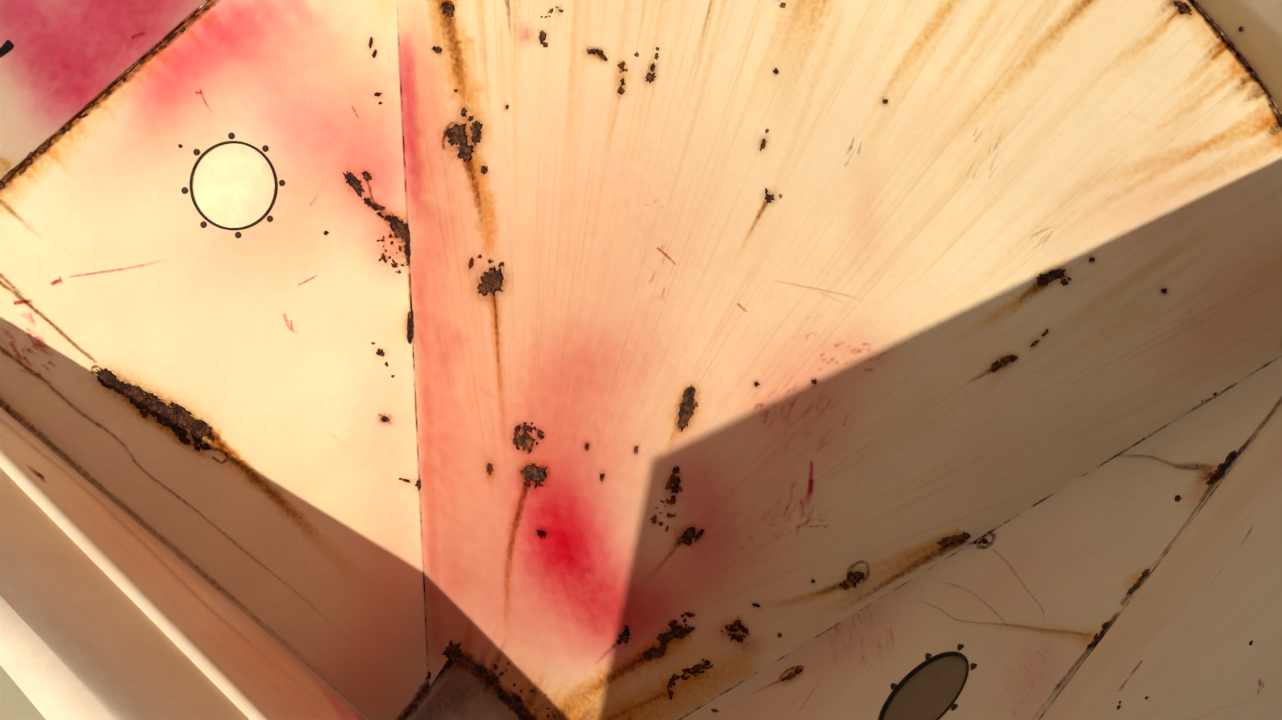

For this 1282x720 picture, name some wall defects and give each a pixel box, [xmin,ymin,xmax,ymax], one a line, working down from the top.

rust [0,0,216,190]
rust [431,1,455,54]
rust [1173,0,1282,127]
rust [442,108,488,179]
rust [342,171,414,344]
rust [468,254,505,329]
rust [1034,268,1071,291]
rust [0,275,284,503]
rust [677,385,698,432]
rust [513,422,547,520]
rust [650,466,705,546]
rust [613,612,695,679]